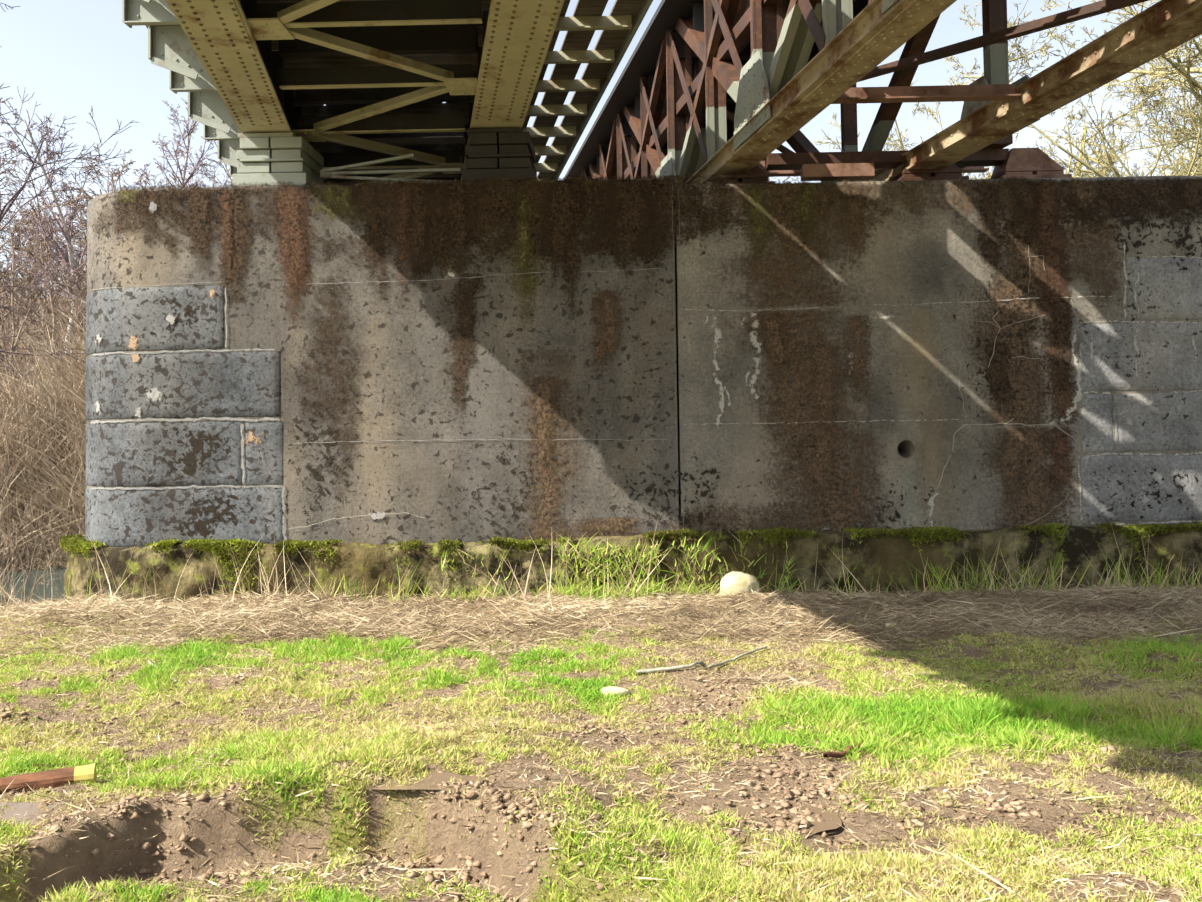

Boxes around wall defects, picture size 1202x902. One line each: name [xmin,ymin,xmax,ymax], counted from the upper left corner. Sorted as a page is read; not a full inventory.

water stain [96,175,1202,541]
crack [936,245,1081,490]
corrosion [1039,213,1079,425]